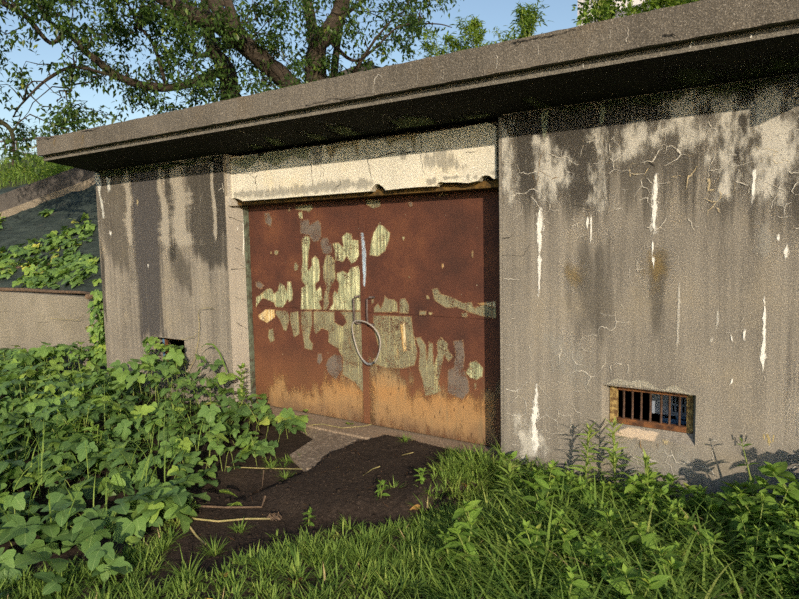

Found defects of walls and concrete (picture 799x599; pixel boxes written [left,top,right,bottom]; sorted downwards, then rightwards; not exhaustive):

damp [95,173,110,218]
damp [233,148,308,168]
crack [502,116,798,280]
damp [502,79,799,297]
damp [122,154,227,339]
rust [260,361,500,446]
damp [514,383,547,461]
crack [505,307,629,448]
crack [629,439,719,479]